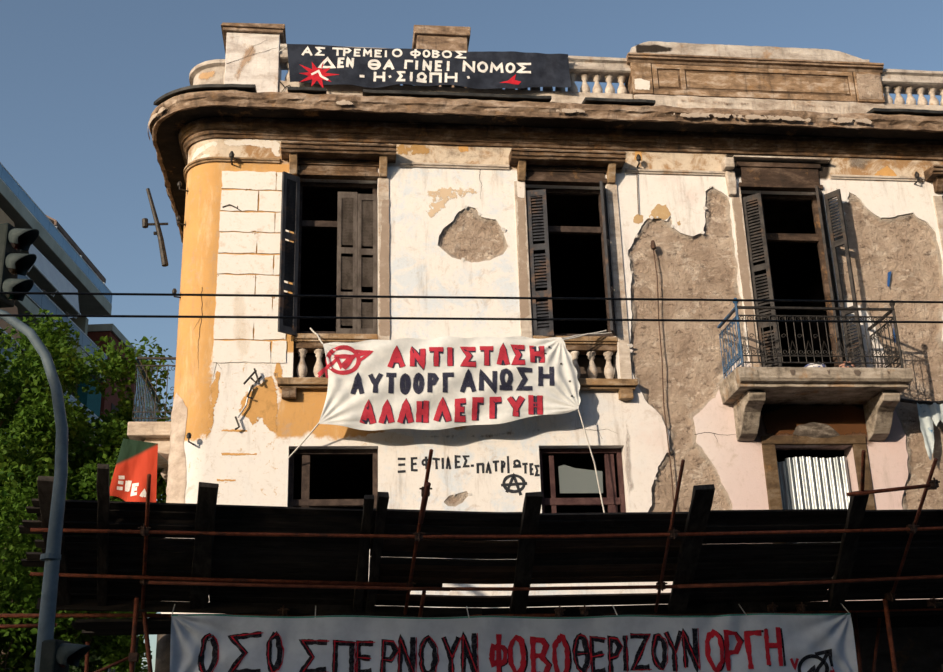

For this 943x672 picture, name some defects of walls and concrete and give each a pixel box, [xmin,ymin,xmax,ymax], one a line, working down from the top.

spalling [426,187,529,318]
peeling [206,363,282,436]
spalling [627,186,759,512]
spalling [836,193,943,510]
spalling [444,491,472,507]